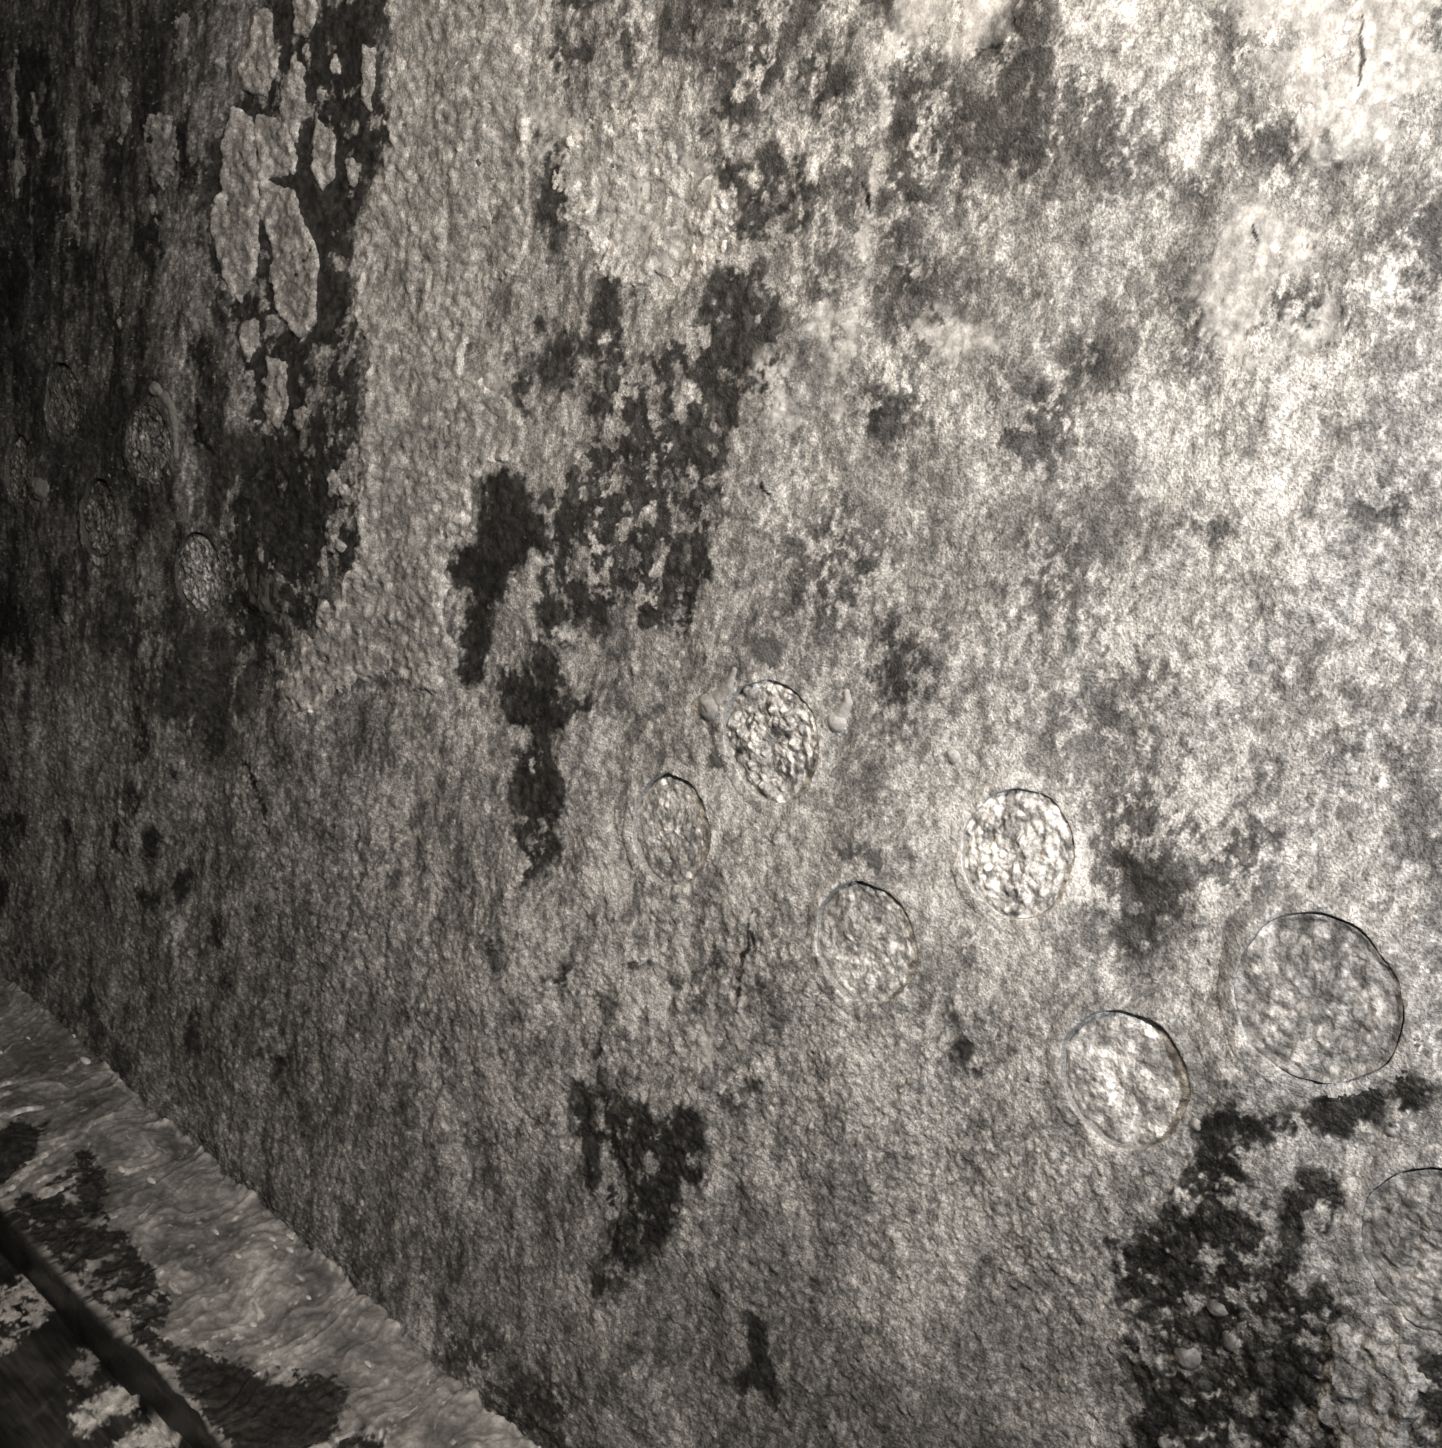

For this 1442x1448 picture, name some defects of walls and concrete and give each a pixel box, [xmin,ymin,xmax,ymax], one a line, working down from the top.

damp [547,0,600,90]
damp [610,2,639,71]
damp [659,0,856,139]
damp [846,0,1057,337]
damp [830,357,897,447]
damp [444,130,819,902]
damp [1109,852,1191,962]
damp [541,962,577,995]
damp [701,909,773,1084]
damp [948,1008,983,1077]
damp [567,991,711,1307]
damp [1099,1070,1442,1448]